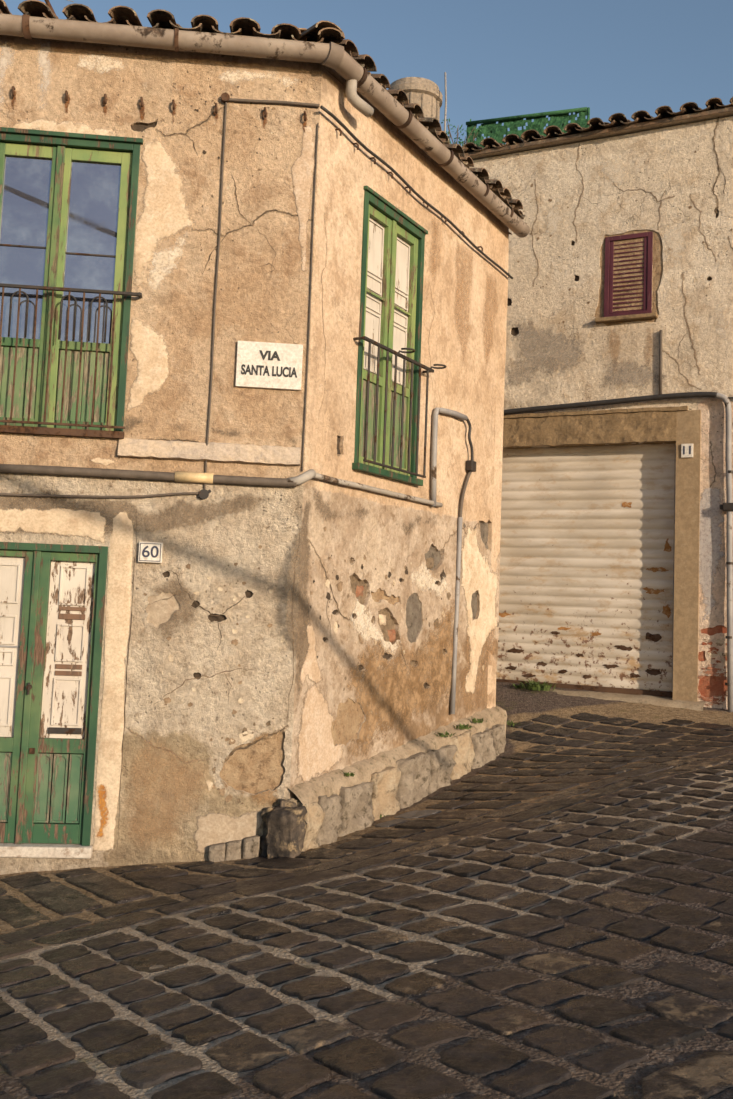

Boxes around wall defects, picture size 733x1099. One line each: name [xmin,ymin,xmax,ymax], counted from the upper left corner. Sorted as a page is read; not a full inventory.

peeling [10,119,116,136]
peeling [131,122,193,288]
crack [156,106,225,156]
crack [531,179,539,287]
crack [573,106,733,262]
peeling [127,319,169,410]
crack [662,274,700,389]
spalling [143,563,260,646]
peeling [300,521,547,694]
crack [117,508,368,846]
flaking render [698,625,727,706]
spalling [203,718,285,805]